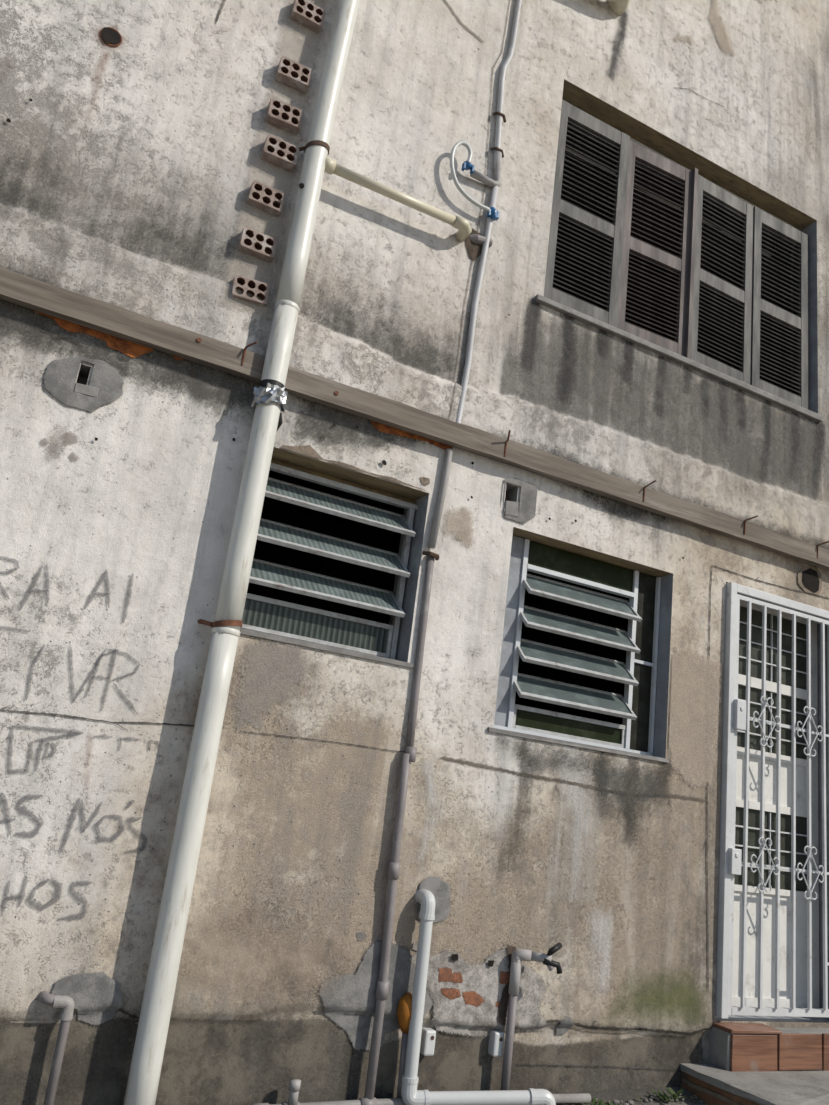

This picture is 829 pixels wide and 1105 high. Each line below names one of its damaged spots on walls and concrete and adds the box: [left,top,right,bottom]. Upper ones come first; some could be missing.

water stain [609,11,628,79]
water stain [90,207,232,276]
spalling [28,308,154,360]
water stain [0,299,257,409]
water stain [501,299,825,499]
crack [0,705,194,729]
water stain [498,735,673,869]
spalling [409,942,548,1038]
water stain [0,1018,139,1105]
water stain [155,1018,402,1105]
water stain [417,1028,703,1094]